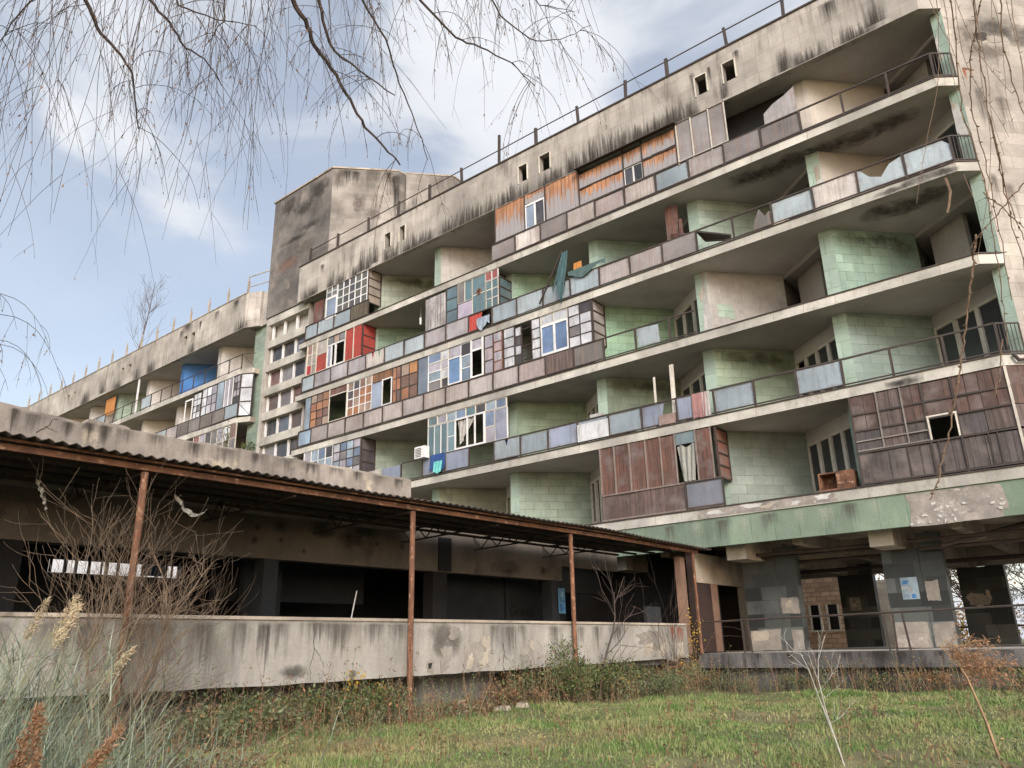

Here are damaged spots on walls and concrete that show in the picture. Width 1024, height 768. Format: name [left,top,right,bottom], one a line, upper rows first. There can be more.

damp [817,114,906,151]
damp [304,108,695,299]
damp [874,189,945,214]
spalling [905,484,1009,527]
damp [259,624,283,644]
damp [313,623,348,645]
flaking render [426,626,491,673]